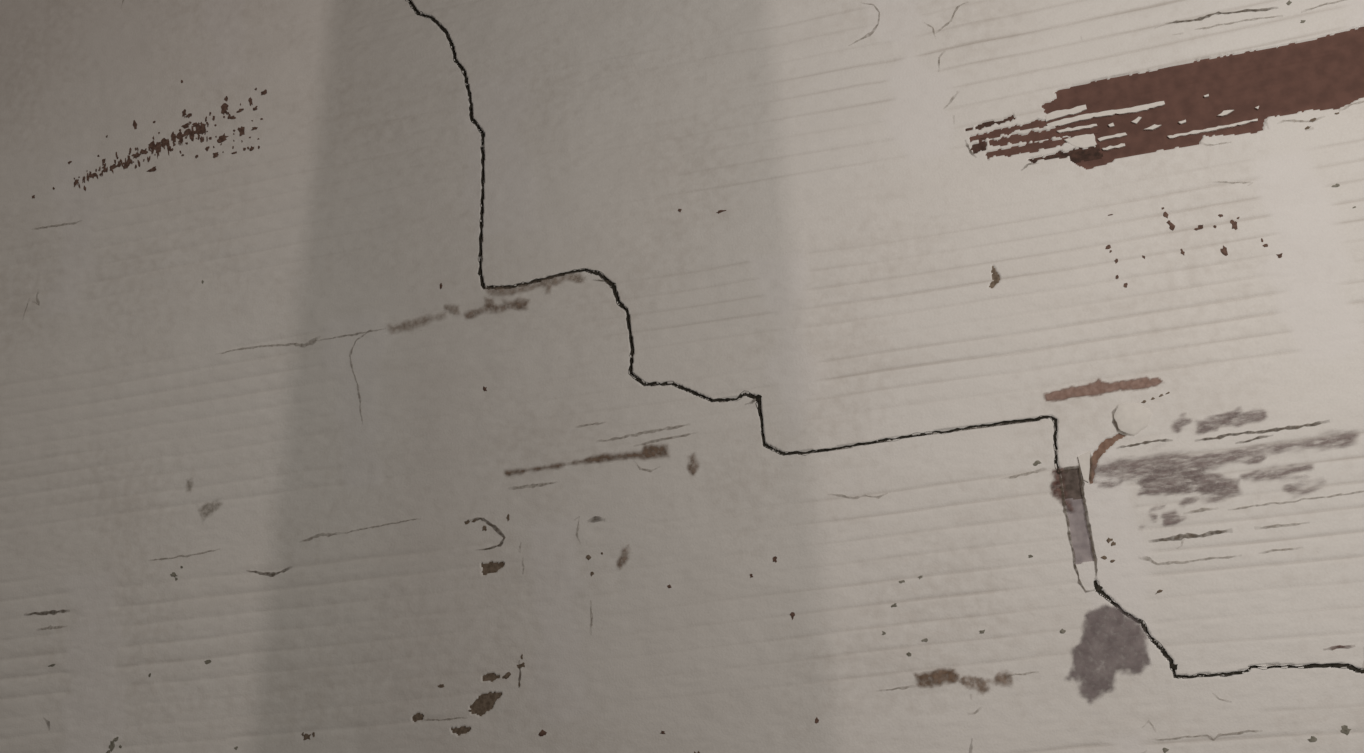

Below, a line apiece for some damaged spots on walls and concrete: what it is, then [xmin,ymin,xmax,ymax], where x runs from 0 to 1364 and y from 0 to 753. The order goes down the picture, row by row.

crack [1173,0,1325,23]
crack [405,0,1061,474]
peeling [1045,377,1170,592]
crack [1094,580,1364,679]